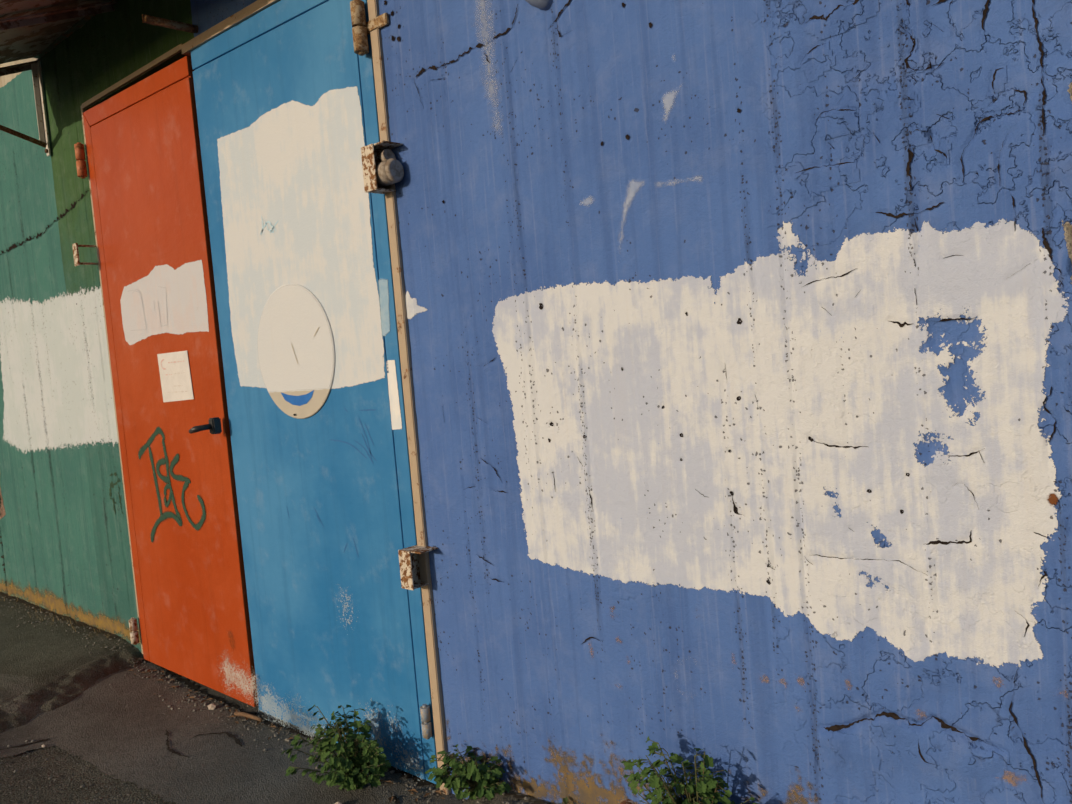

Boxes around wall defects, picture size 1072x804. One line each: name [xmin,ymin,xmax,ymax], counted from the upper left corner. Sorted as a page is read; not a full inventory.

crack [550,0,571,37]
crack [415,5,518,108]
crack [960,0,1046,227]
crack [876,139,944,231]
crack [0,191,87,255]
crack [1008,228,1064,288]
spalling [1062,220,1072,283]
crack [889,259,977,327]
crack [1043,386,1056,442]
crack [0,498,8,585]
leakage [0,581,141,643]
leakage [785,778,818,804]